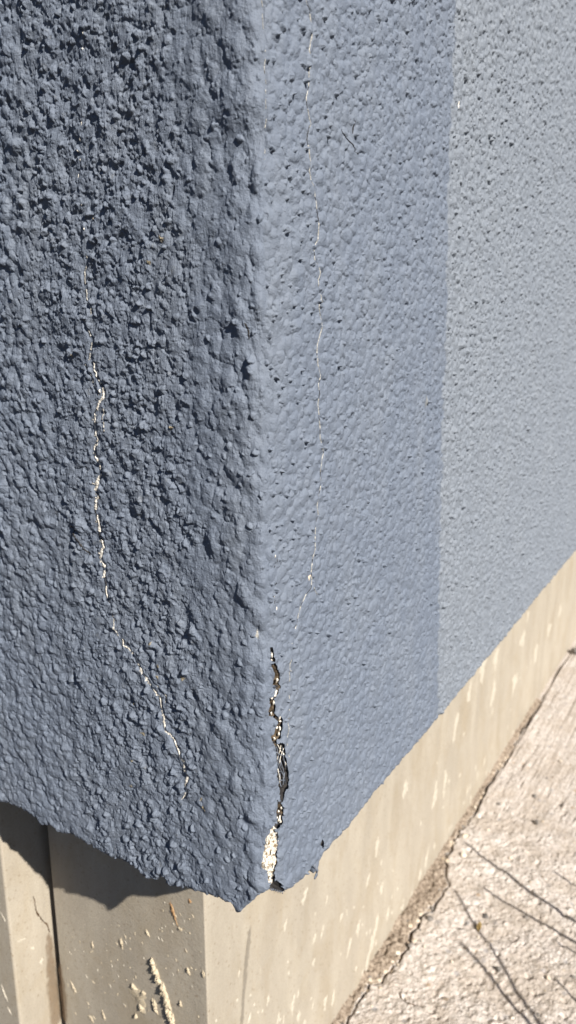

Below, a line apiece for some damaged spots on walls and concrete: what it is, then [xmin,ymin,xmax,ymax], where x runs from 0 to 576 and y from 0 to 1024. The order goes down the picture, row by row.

crack [84,256,189,799]
crack [268,647,292,828]